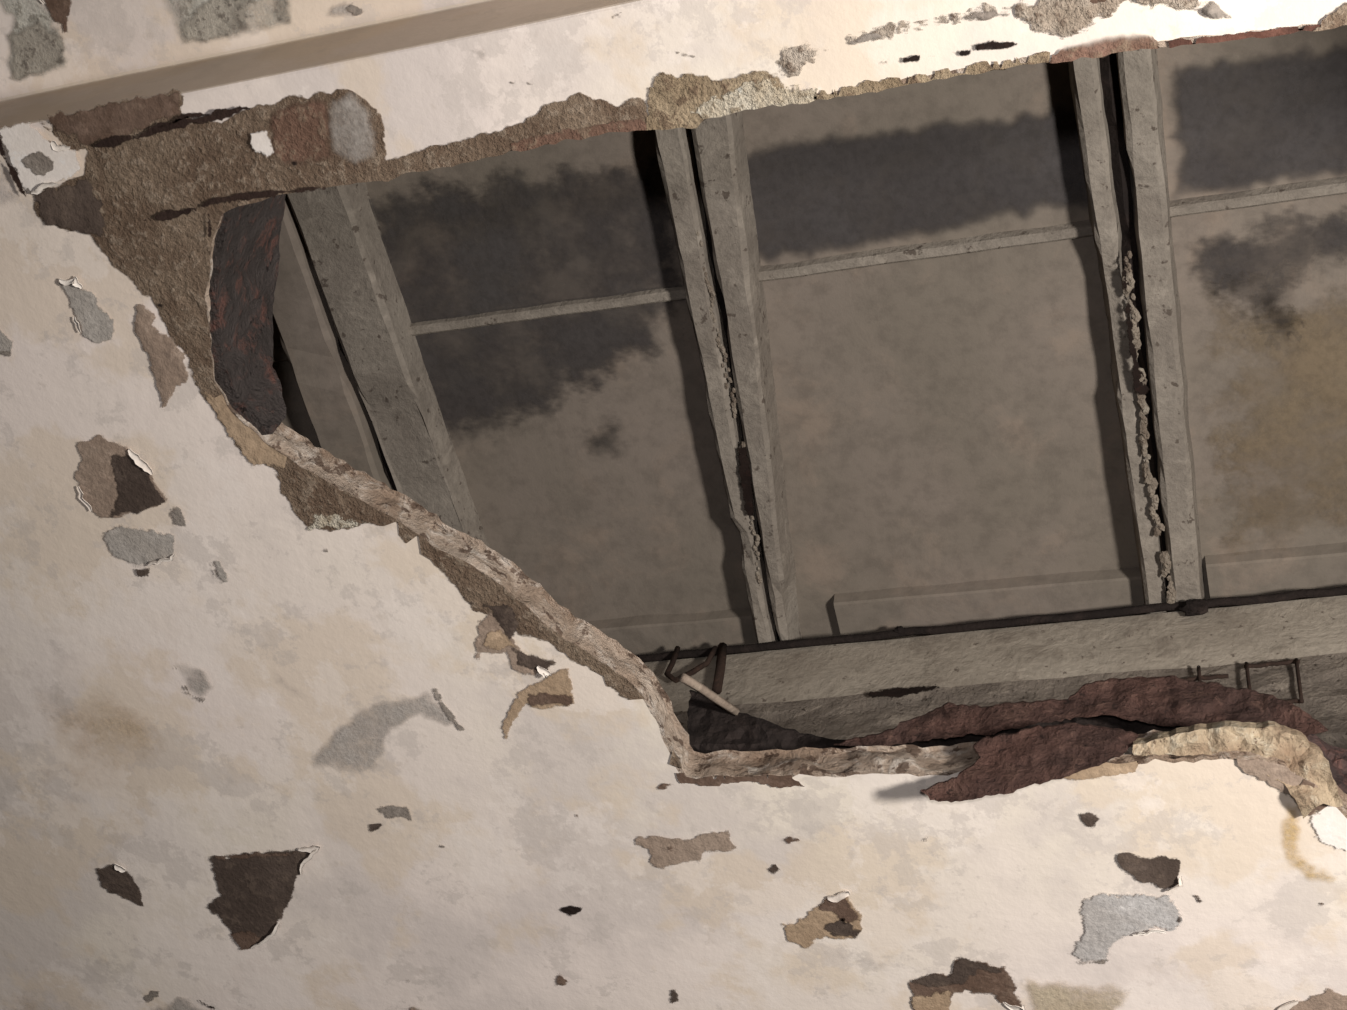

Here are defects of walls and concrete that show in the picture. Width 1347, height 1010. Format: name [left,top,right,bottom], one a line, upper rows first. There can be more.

leakage [369,168,679,432]
spalling [31,36,1169,739]
spalling [658,724,805,790]
rust [834,675,1328,803]
spalling [1064,761,1138,780]
spalling [369,805,412,832]
spalling [1080,812,1099,827]
peeling [208,845,320,950]
peeling [782,891,862,948]
peeling [1073,852,1202,965]
peeling [909,957,1025,1010]
peeling [1277,989,1347,1010]